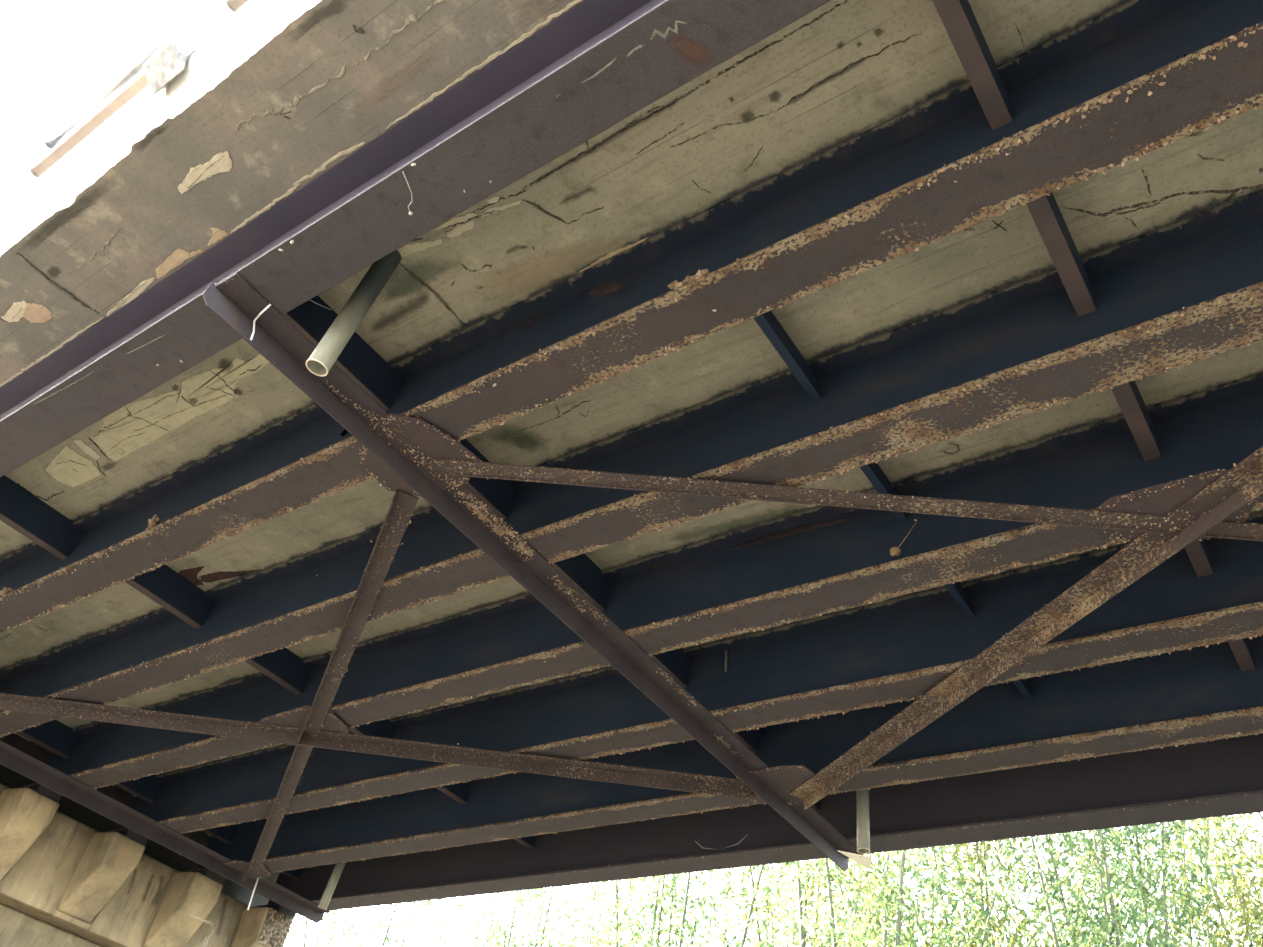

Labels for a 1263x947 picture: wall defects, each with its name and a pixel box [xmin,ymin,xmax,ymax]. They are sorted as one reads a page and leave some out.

spalling [386,0,583,129]
crack [515,0,918,224]
spalling [0,142,365,386]
crack [1066,154,1263,227]
peeling [17,354,269,501]
rust [178,566,257,585]